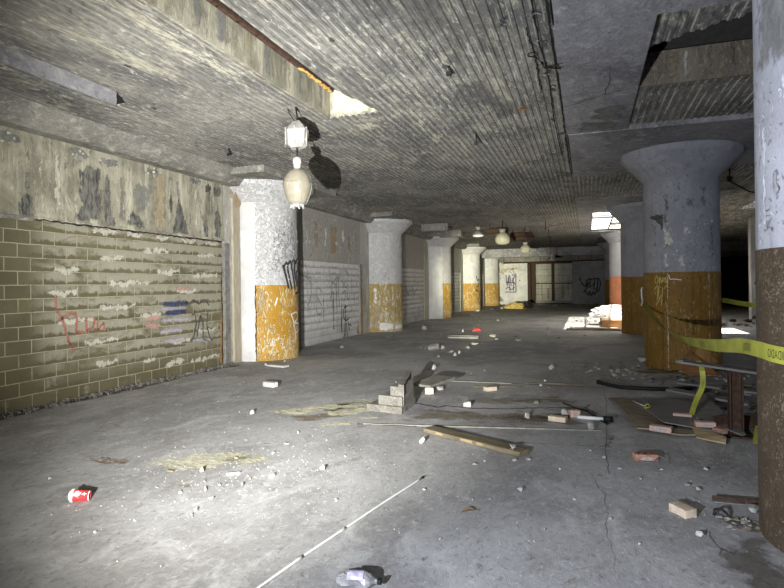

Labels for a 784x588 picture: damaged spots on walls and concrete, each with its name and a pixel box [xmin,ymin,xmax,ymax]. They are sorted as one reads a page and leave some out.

spalling [331,90,383,122]
peeling [759,74,784,243]
water stain [18,172,34,216]
water stain [75,166,152,228]
water stain [169,182,222,237]
water stain [49,290,78,298]
water stain [110,279,148,288]
water stain [177,272,217,294]
water stain [58,317,93,325]
water stain [166,353,220,368]
crack [415,402,524,410]
crack [515,383,620,583]